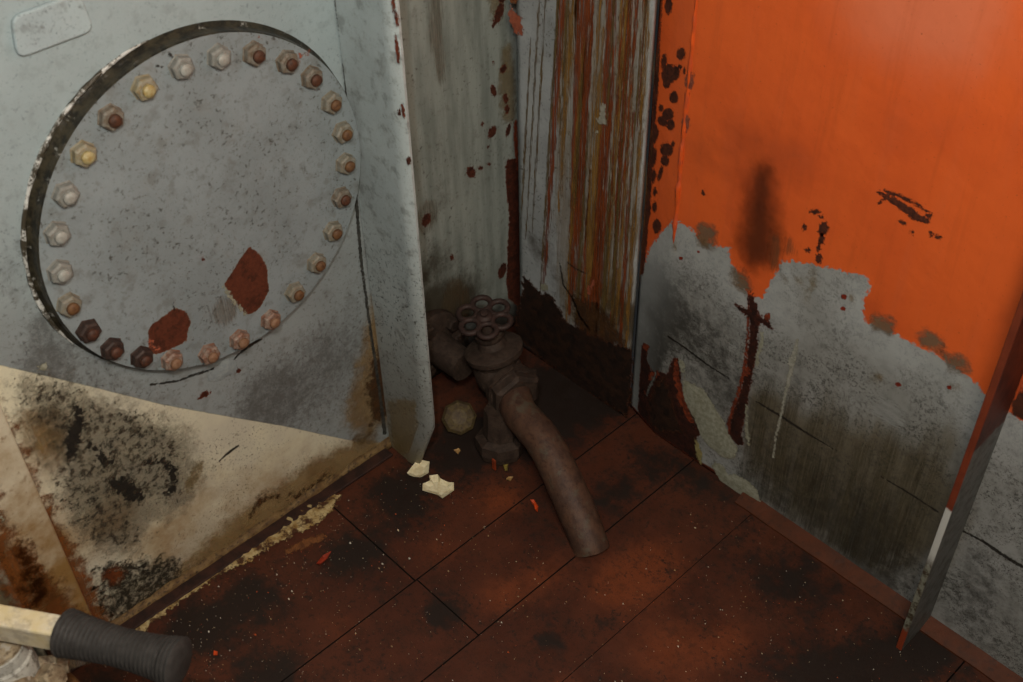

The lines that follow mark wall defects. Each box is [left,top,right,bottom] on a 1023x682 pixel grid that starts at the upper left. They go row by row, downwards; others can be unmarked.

corrosion [505,0,650,418]
spalling [876,188,942,239]
corrosion [0,411,113,622]
mould [14,373,181,548]
mould [91,554,181,622]
corrosion [180,315,387,574]
peeling [637,343,762,502]
corrosion [727,290,773,446]